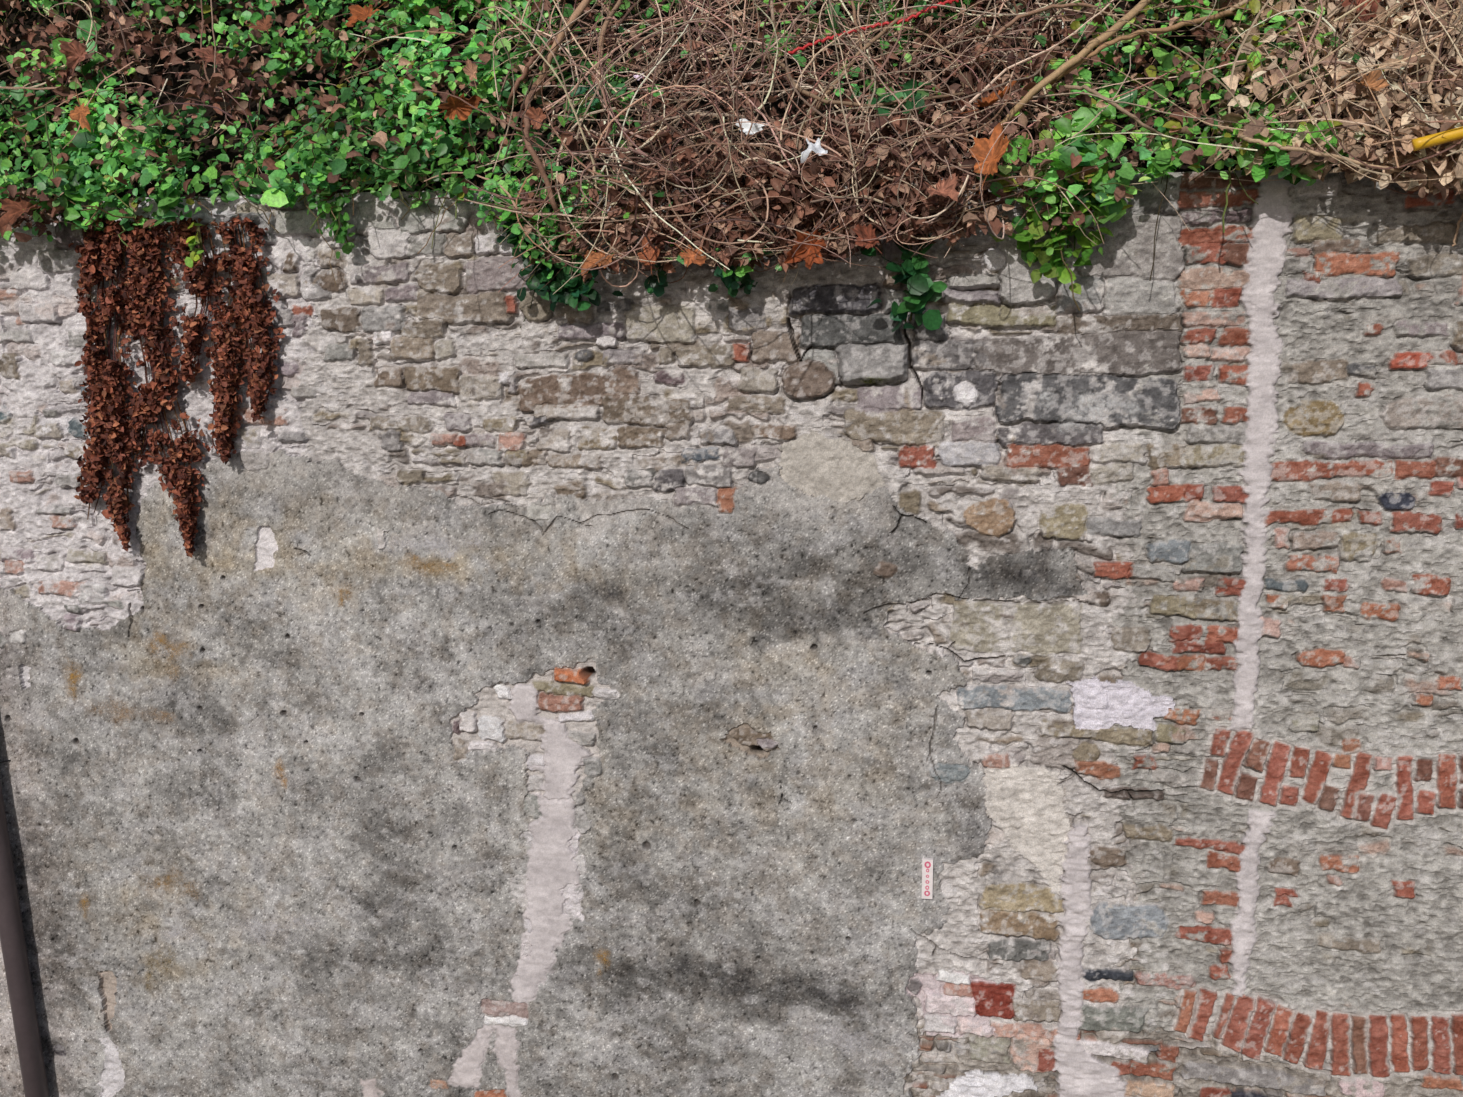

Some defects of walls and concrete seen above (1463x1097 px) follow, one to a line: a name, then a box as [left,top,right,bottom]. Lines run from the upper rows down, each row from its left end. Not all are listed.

flaking render [778,429,887,501]
crack [451,494,690,535]
flaking render [255,525,278,570]
crack [864,566,1080,613]
crack [919,641,1007,664]
flaking render [1067,675,1176,731]
spalling [723,723,781,759]
spalling [451,659,622,922]
flaking render [982,762,1071,895]
spalling [906,967,1018,1038]
flaking render [936,1068,1038,1097]